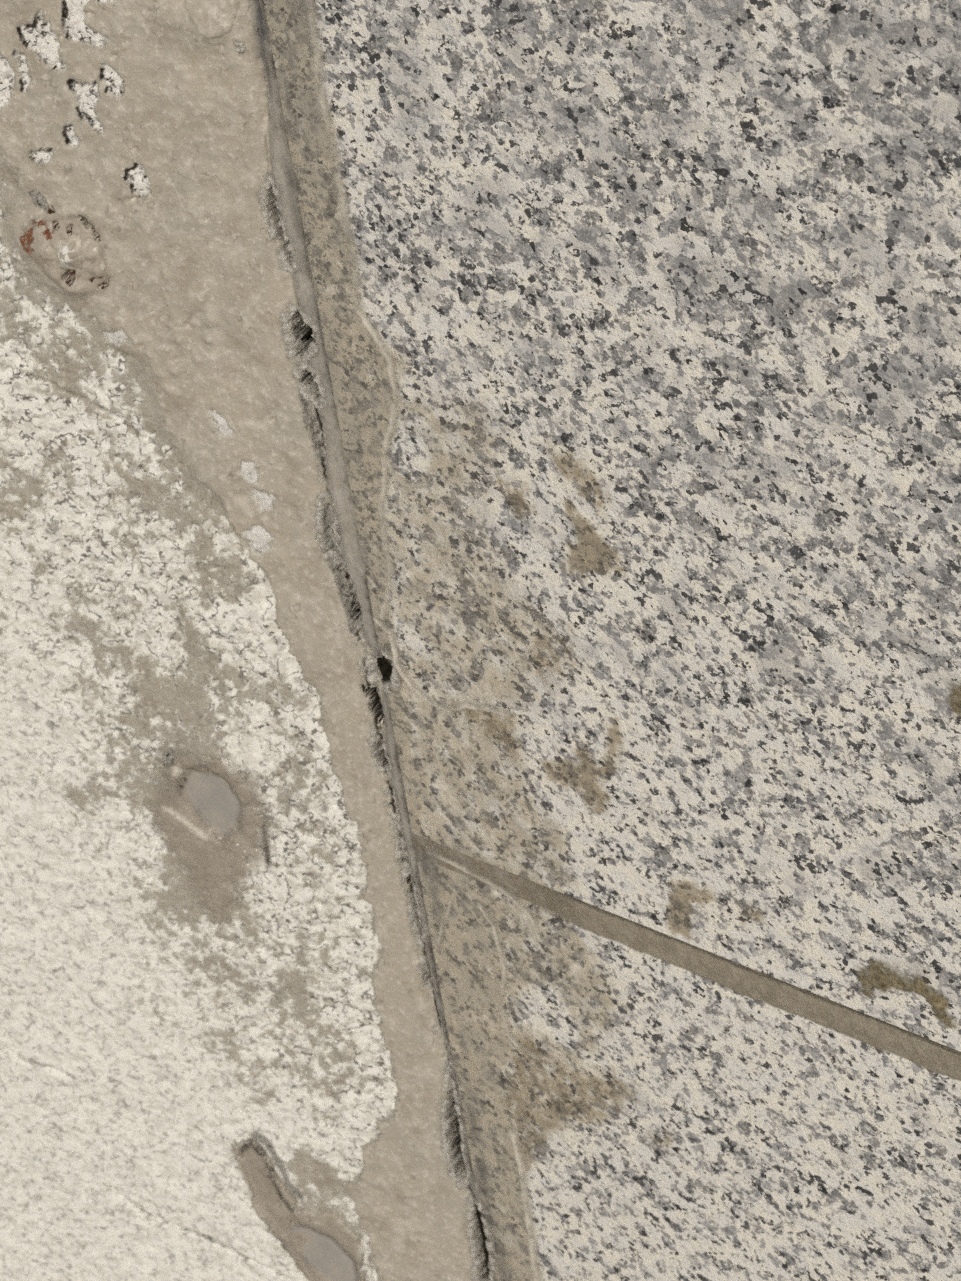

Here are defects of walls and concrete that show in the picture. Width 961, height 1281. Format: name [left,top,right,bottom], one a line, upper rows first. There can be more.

peeling [0,0,126,165]
peeling [123,162,150,198]
crack [257,175,300,274]
crack [299,393,496,1281]